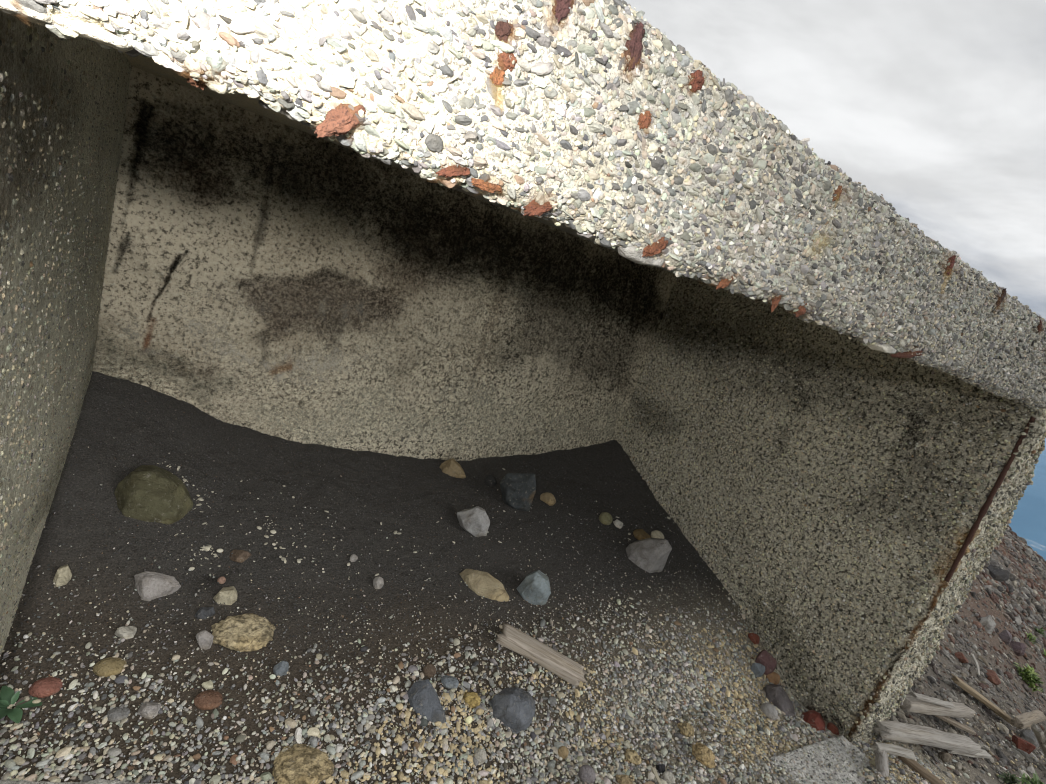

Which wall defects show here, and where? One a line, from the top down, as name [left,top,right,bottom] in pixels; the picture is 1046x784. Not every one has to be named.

corrosion [552,0,574,23]
corrosion [489,18,517,87]
corrosion [623,22,645,75]
corrosion [688,70,705,92]
corrosion [314,103,366,138]
corrosion [638,111,652,130]
corrosion [436,165,503,193]
corrosion [522,200,557,217]
water stain [127,101,861,406]
corrosion [642,237,671,258]
crack [144,250,188,350]